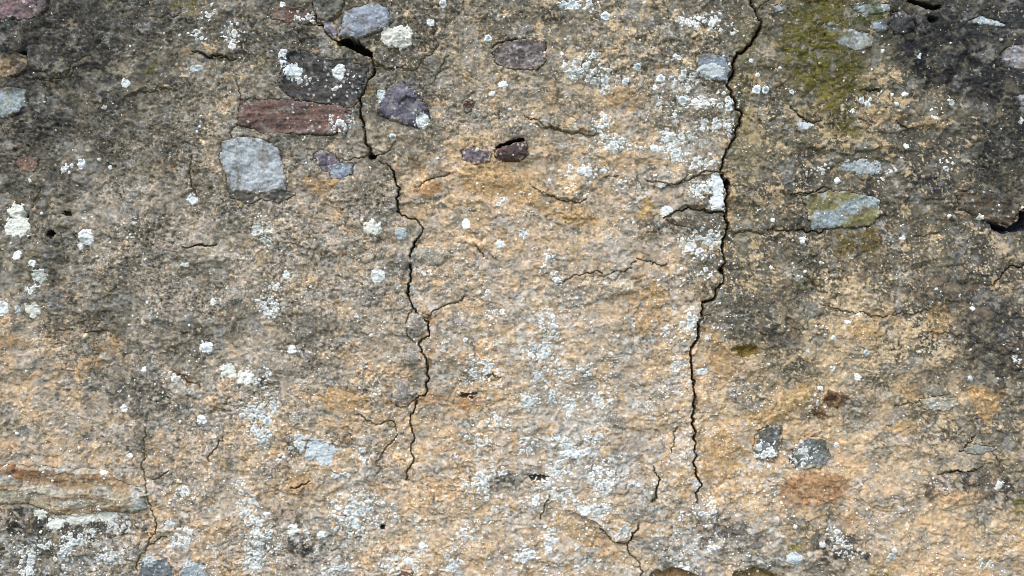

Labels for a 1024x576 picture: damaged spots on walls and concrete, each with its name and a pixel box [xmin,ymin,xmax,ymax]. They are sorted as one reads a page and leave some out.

crack [337,47,465,481]
crack [599,0,856,576]